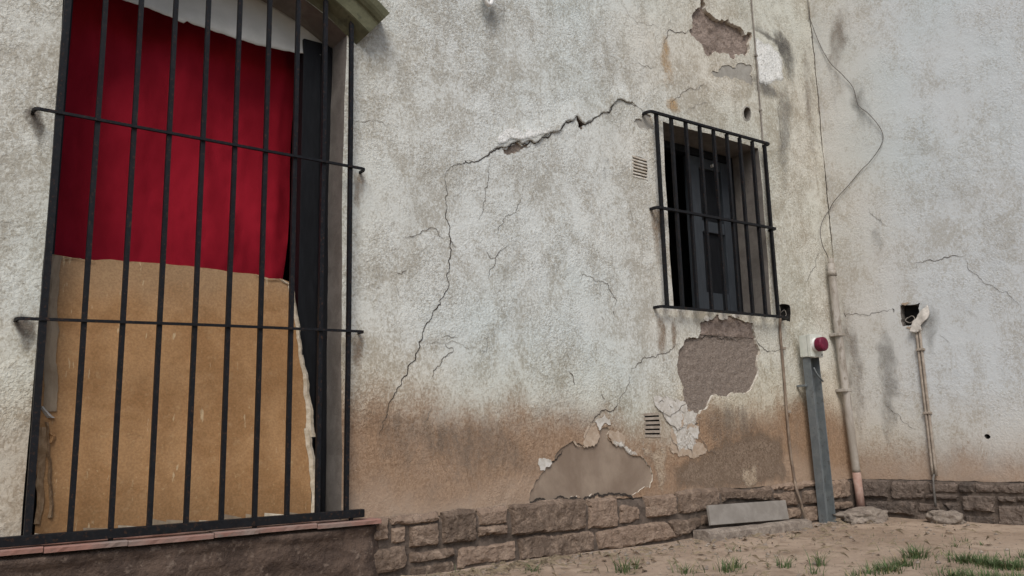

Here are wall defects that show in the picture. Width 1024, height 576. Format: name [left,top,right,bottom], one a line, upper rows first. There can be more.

spalling [665,0,783,85]
crack [379,99,643,436]
crack [914,255,1018,303]
crack [589,344,676,429]
spalling [529,313,760,503]